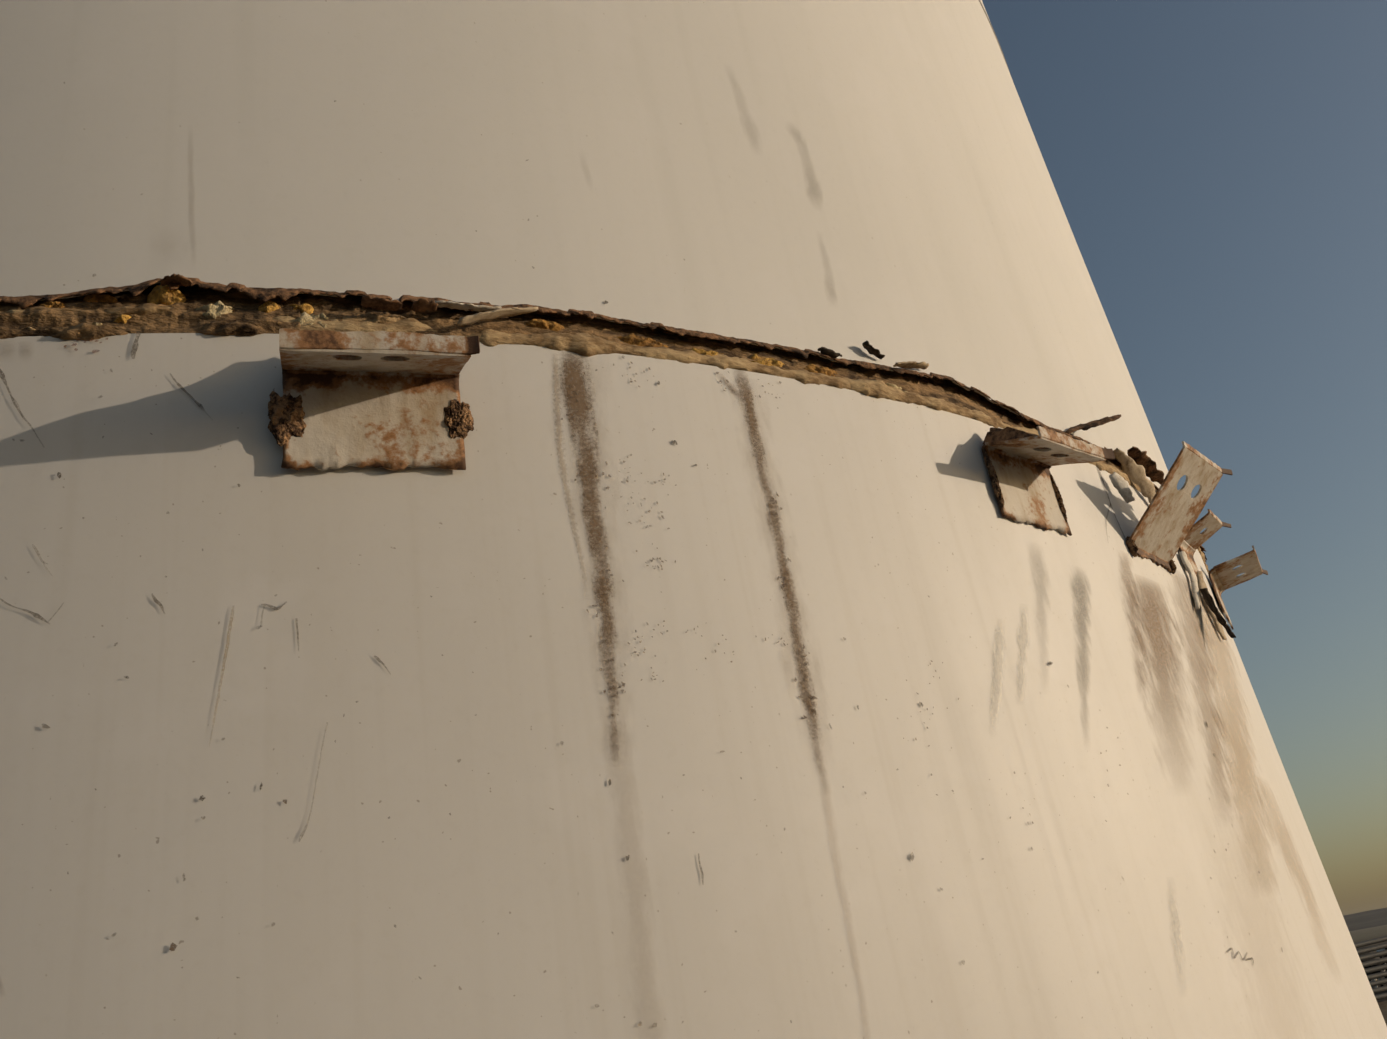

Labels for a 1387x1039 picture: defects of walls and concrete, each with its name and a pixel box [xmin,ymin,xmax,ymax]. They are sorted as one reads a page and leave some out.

peeling [160,274,193,287]
peeling [361,295,538,326]
peeling [818,347,842,358]
peeling [862,341,929,370]
peeling [1065,414,1121,434]
peeling [1109,446,1164,503]
peeling [1179,551,1236,640]